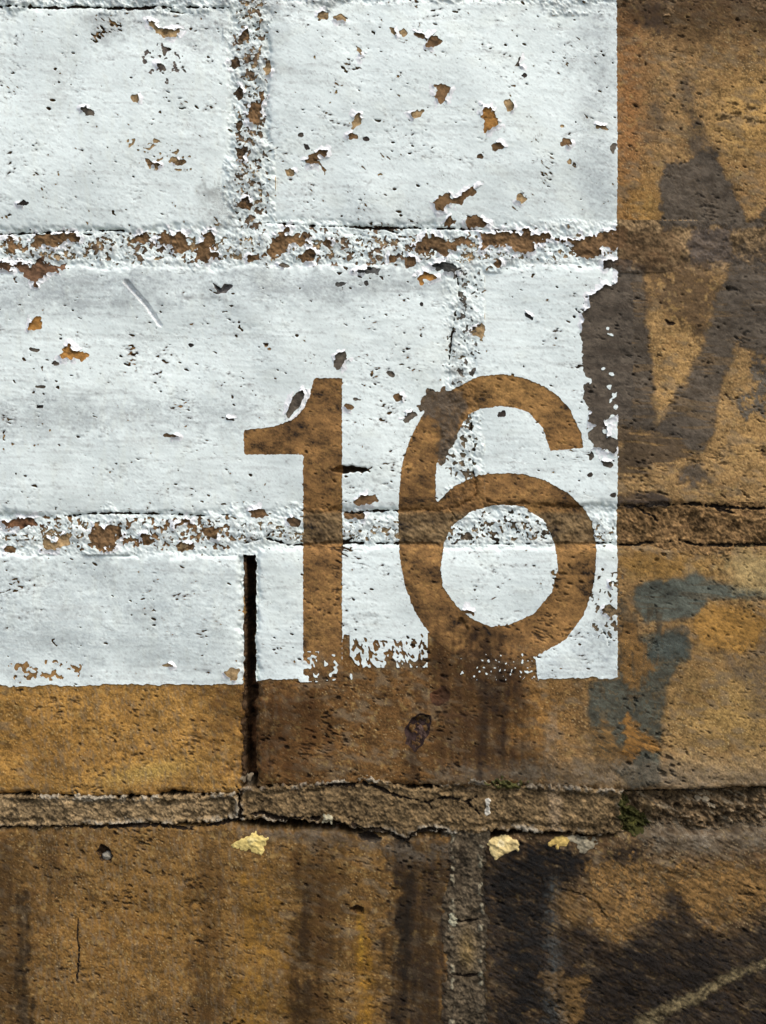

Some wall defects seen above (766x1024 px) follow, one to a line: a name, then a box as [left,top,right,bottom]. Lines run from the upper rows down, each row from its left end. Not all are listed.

peeling [142,16,187,85]
peeling [127,138,192,172]
peeling [225,3,634,385]
peeling [0,224,222,290]
peeling [584,389,633,477]
peeling [0,507,233,557]
peeling [344,489,379,524]
crack [596,502,766,547]
peeling [8,660,83,681]
crack [0,780,480,847]
crack [621,786,766,794]
leakage [372,833,461,1024]